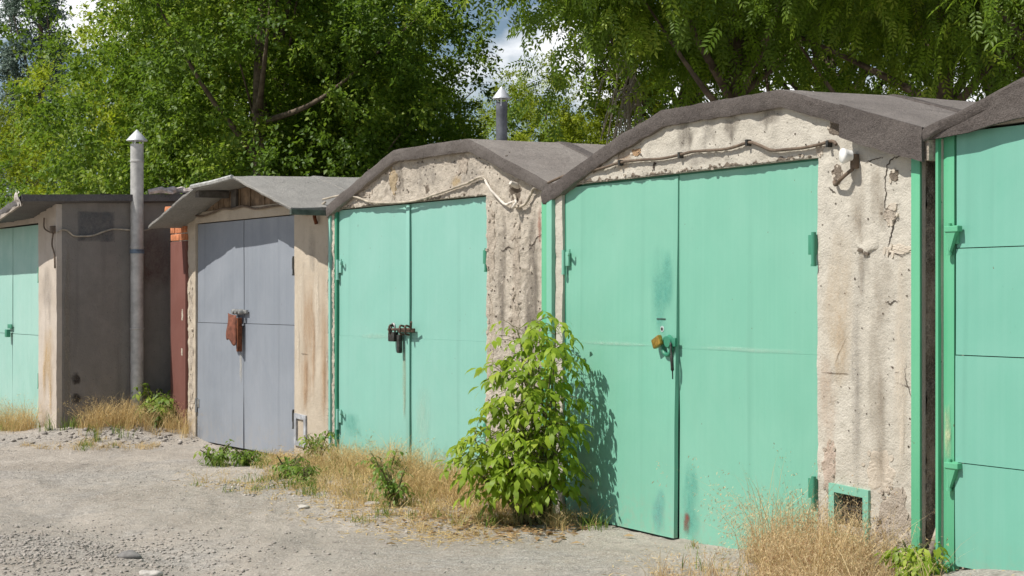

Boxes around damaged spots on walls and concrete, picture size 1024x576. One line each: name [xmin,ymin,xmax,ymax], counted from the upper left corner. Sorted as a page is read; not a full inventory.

spalling [827,121,839,136]
spalling [340,164,401,209]
spalling [508,178,522,206]
spalling [576,146,825,184]
spalling [831,164,844,181]
crack [866,156,910,257]